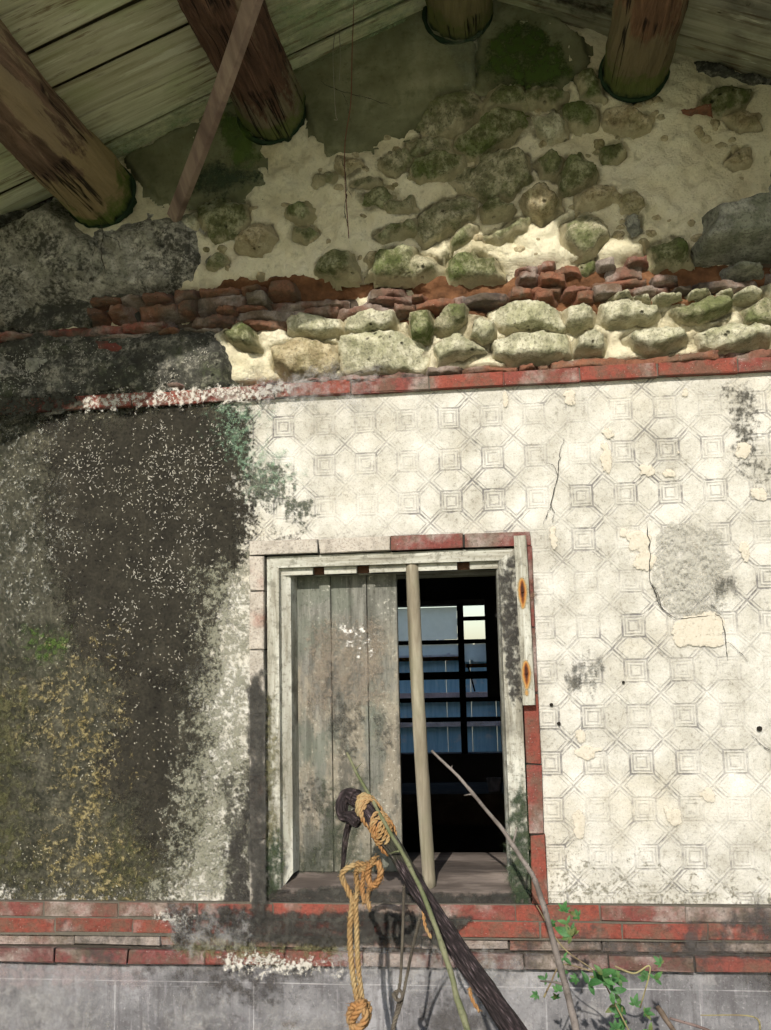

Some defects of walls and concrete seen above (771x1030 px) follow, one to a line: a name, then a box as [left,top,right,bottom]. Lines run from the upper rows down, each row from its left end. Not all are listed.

flaking render [563,389,576,405]
flaking render [735,442,752,459]
damp [722,386,771,482]
flaking render [619,527,657,571]
corrosion [518,578,535,609]
damp [711,576,739,614]
flaking render [671,611,725,647]
damp [0,381,439,993]
corrosion [522,661,531,696]
damp [564,657,605,696]
damp [548,851,741,904]
damp [433,892,531,931]